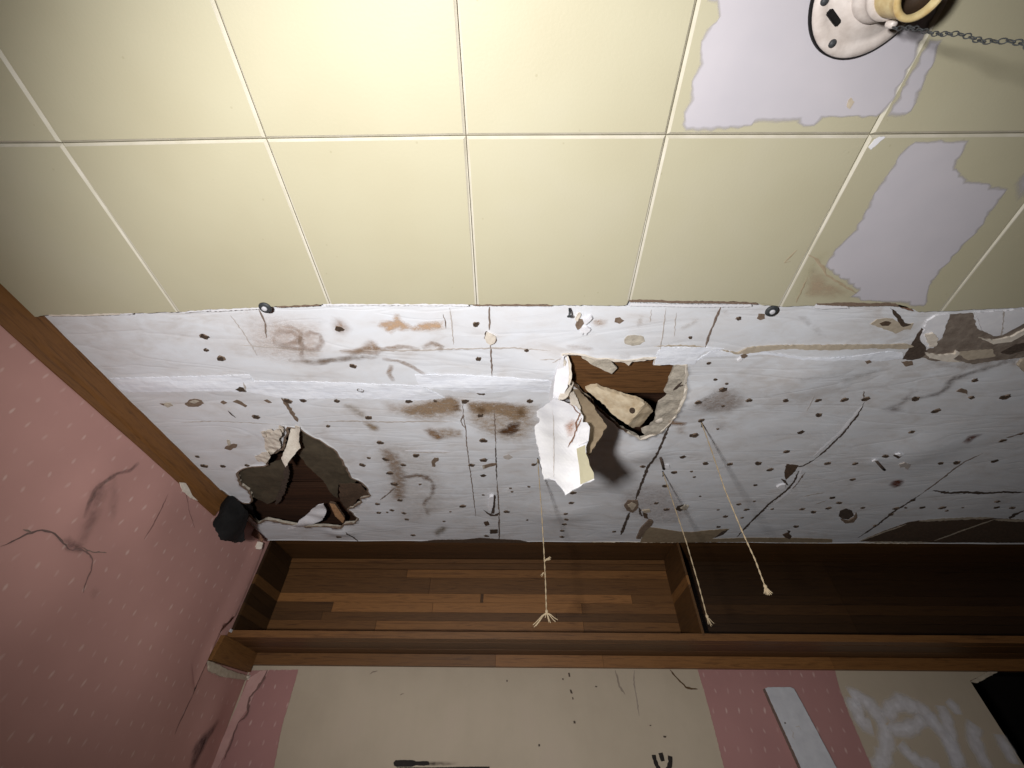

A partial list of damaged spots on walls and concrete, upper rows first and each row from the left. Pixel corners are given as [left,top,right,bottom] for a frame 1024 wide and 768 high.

damp [381,317,440,346]
damp [401,398,531,435]
spalling [581,356,646,374]
spalling [641,365,689,436]
crack [620,424,671,535]
crack [737,392,865,537]
crack [858,453,1024,538]
crack [3,529,106,588]